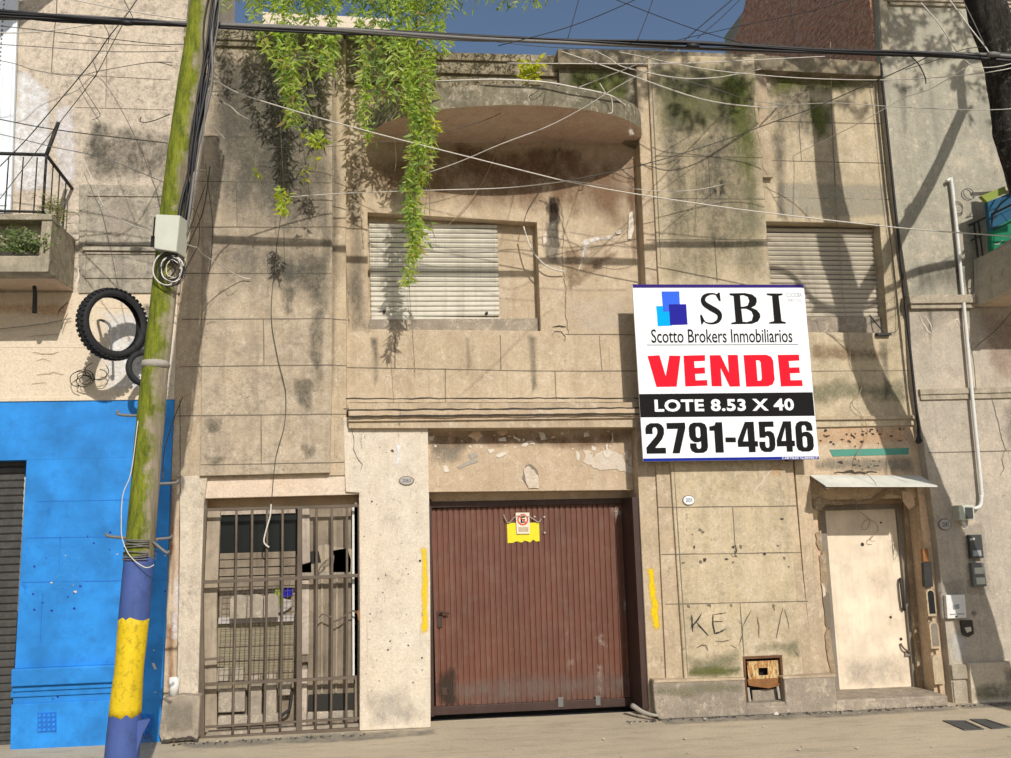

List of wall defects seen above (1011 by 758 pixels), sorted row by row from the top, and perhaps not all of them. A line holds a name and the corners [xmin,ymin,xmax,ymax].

damp [776,77,850,136]
damp [221,58,320,215]
damp [679,76,760,264]
damp [377,149,635,288]
peeling [428,430,633,473]
spalling [522,464,539,489]
peeling [819,428,905,447]